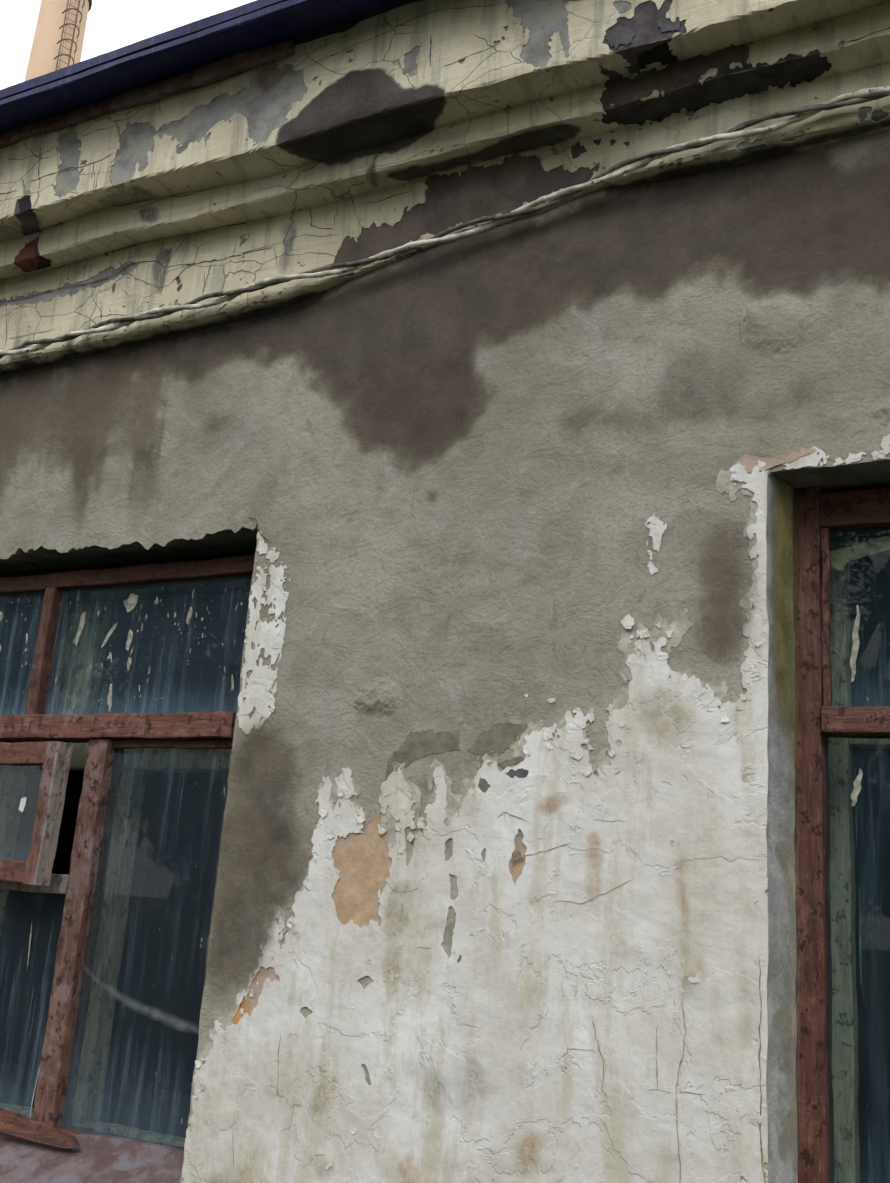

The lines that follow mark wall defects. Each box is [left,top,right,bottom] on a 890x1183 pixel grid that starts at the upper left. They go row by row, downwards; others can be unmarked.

peeling [505,0,570,71]
peeling [599,0,831,126]
flaking render [14,196,52,272]
crack [0,125,209,230]
crack [0,204,338,345]
water stain [0,120,890,485]
peeling [328,139,630,271]
water stain [206,732,296,989]
peeling [180,434,890,1183]
crack [562,1015,604,1093]
crack [650,991,706,1182]
crack [758,960,773,1183]